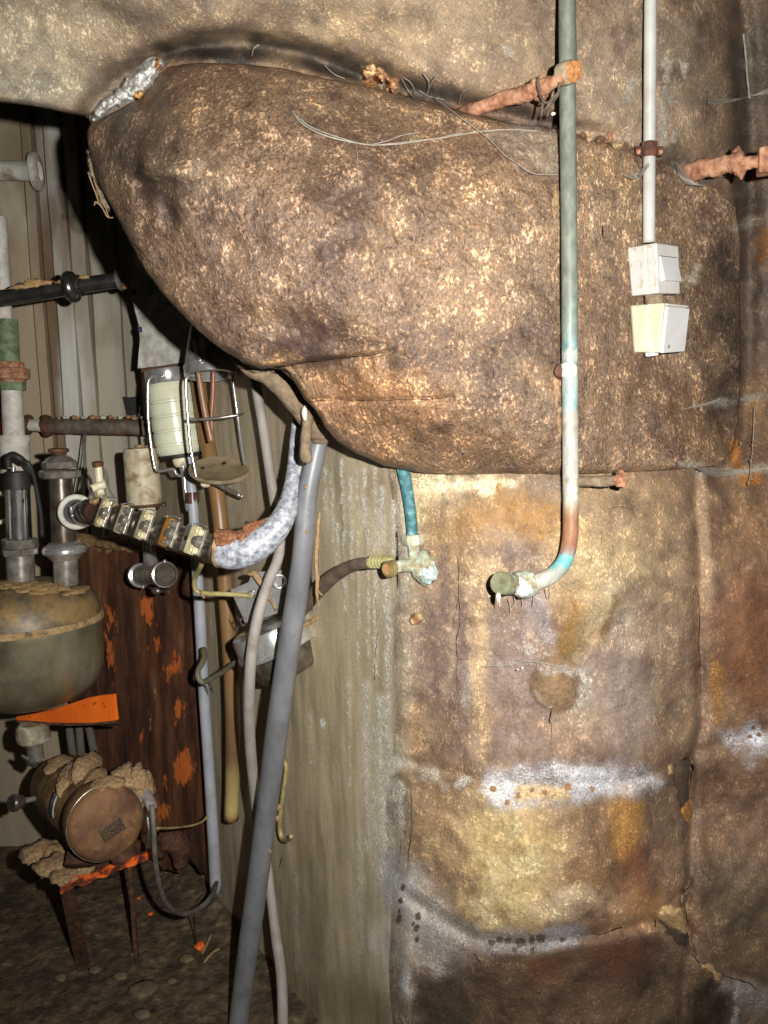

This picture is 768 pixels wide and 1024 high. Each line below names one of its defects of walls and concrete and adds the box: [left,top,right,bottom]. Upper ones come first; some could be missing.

leakage [323,459,397,565]
leakage [343,542,663,1024]
corrosion [609,795,641,873]
crack [683,757,694,787]
leakage [722,721,768,770]
crack [683,881,757,990]